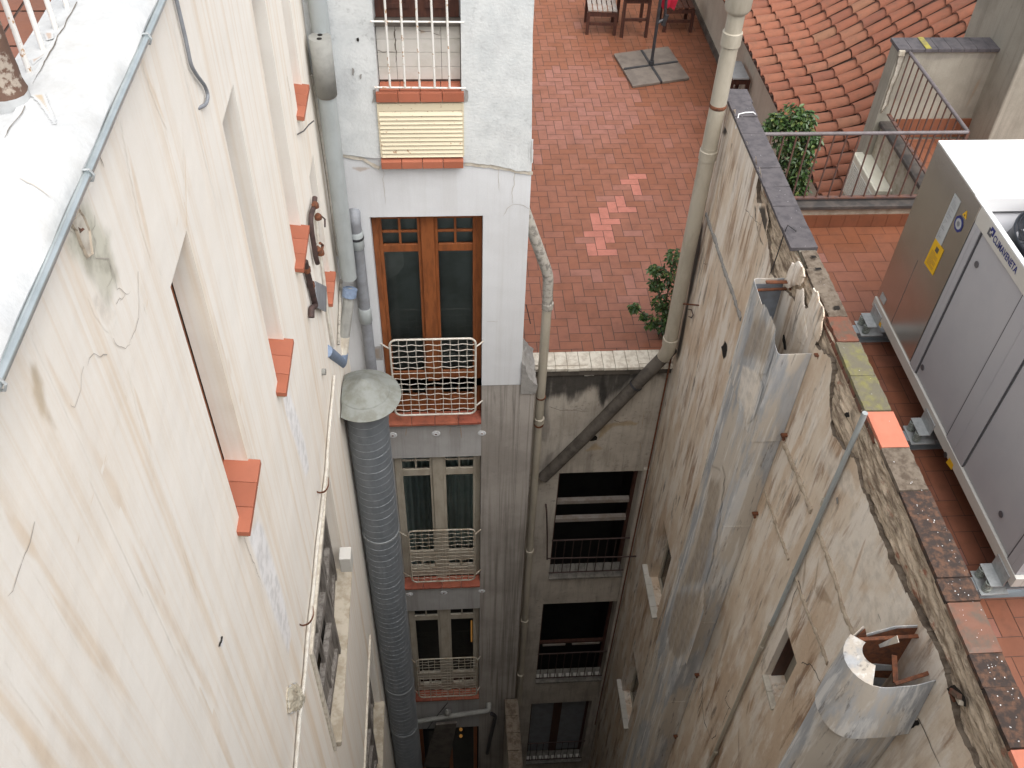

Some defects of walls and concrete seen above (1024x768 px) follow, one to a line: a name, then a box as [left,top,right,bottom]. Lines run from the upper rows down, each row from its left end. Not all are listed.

leakage [60,186,125,331]
crack [92,226,139,303]
spalling [756,177,777,278]
crack [72,318,139,407]
leakage [533,361,672,445]
spalling [783,288,982,768]